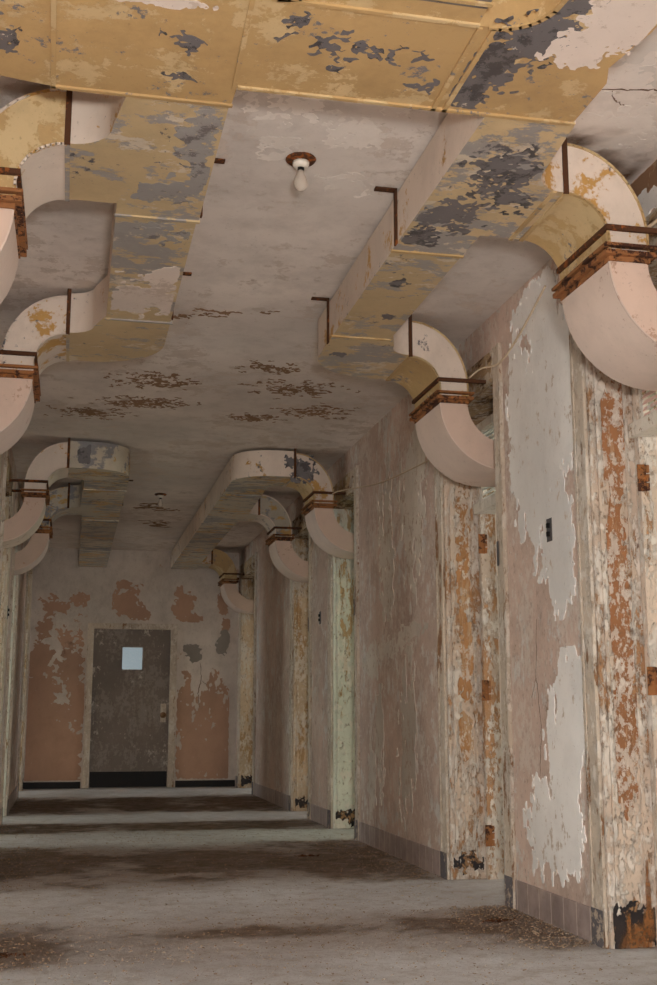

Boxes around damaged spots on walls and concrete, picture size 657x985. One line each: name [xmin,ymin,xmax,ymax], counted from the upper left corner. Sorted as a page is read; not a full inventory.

peeling [274,11,311,43]
peeling [234,91,411,161]
peeling [307,30,435,73]
peeling [403,79,440,96]
peeling [449,0,657,109]
crack [602,88,657,106]
peeling [401,144,544,247]
peeling [44,371,202,420]
peeling [505,265,576,621]
peeling [24,592,90,781]
peeling [522,645,587,888]
rust [623,860,654,949]